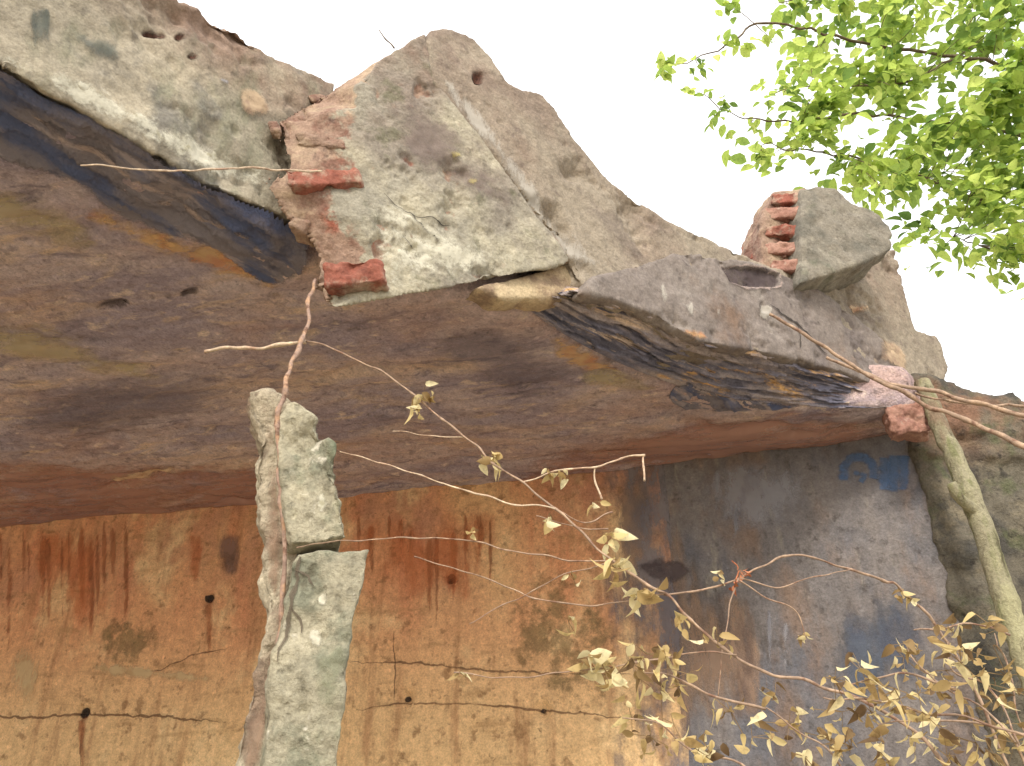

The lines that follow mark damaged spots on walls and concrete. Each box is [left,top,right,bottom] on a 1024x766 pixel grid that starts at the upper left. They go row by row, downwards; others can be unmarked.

corrosion [0,466,257,624]
leakage [220,537,238,573]
corrosion [451,515,492,578]
crack [156,650,218,671]
crack [353,634,626,718]
crack [0,713,225,723]